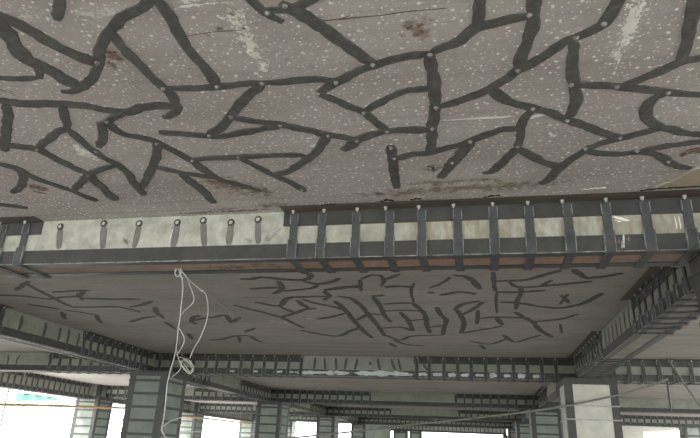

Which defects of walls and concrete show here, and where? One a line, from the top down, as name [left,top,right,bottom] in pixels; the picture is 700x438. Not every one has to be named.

rust [404,21,429,37]
leakage [609,0,655,75]
crack [0,269,624,370]